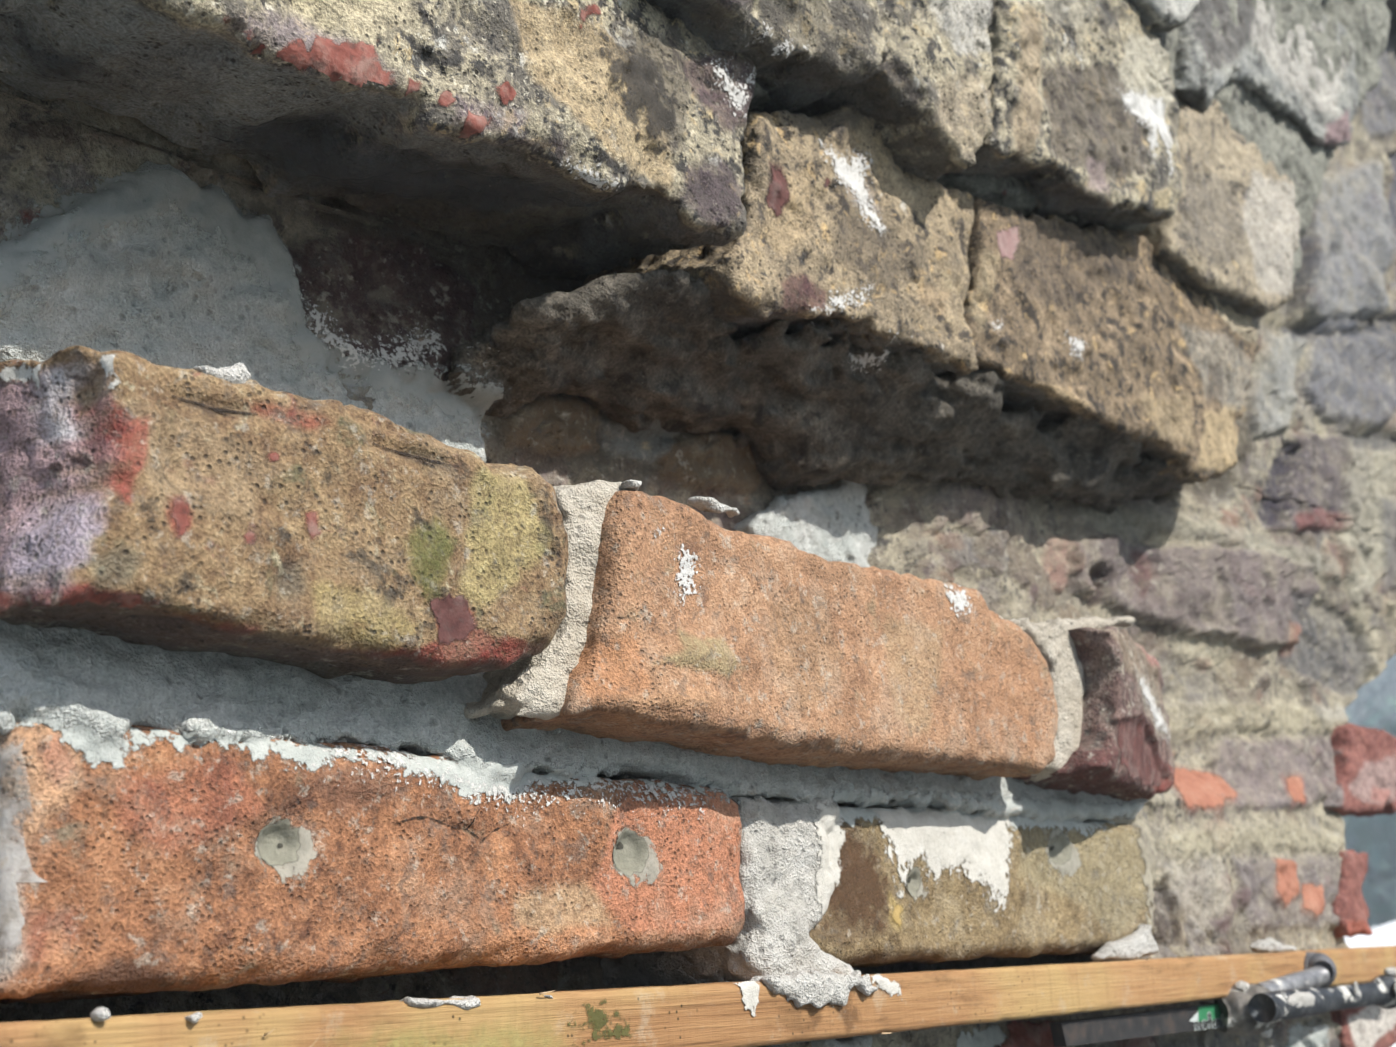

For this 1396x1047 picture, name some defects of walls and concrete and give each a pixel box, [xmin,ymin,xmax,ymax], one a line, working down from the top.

spalling [1286,776,1305,804]
spalling [1322,723,1396,817]
spalling [1275,850,1373,938]